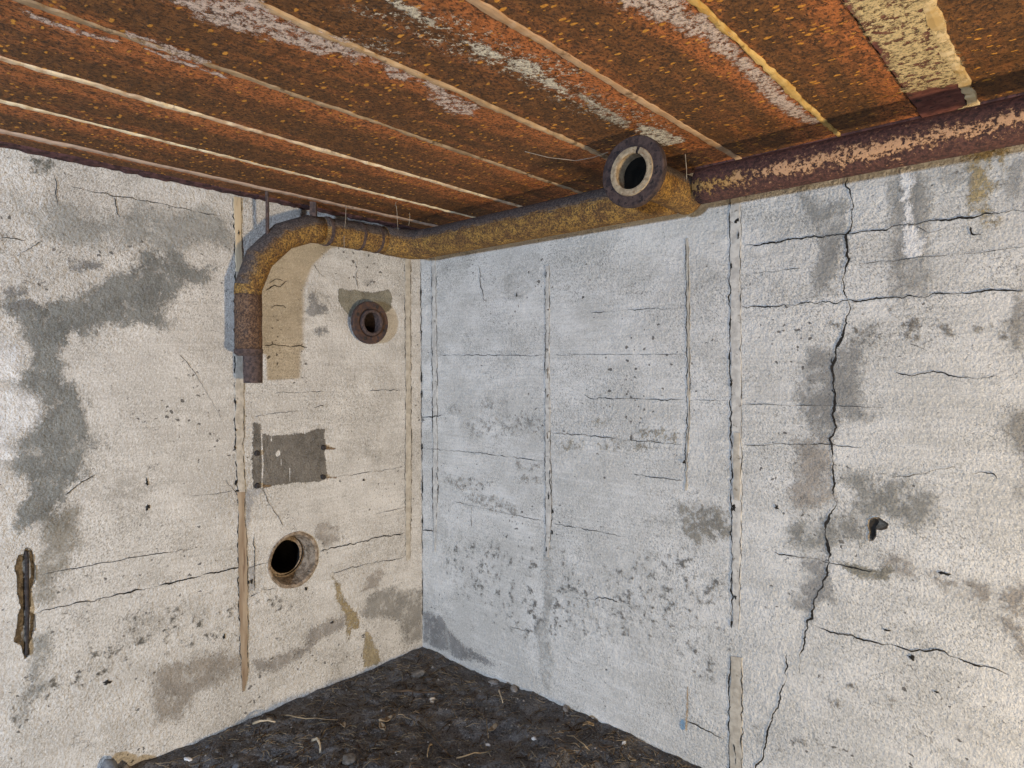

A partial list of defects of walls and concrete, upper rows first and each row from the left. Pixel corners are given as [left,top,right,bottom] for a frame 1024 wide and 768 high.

damp [801,186,849,291]
damp [889,166,930,297]
corrosion [964,149,1008,224]
damp [0,248,215,601]
crack [38,354,323,692]
crack [322,178,1020,768]
spalling [867,517,889,542]
spalling [14,547,36,659]
corrosion [332,577,380,667]